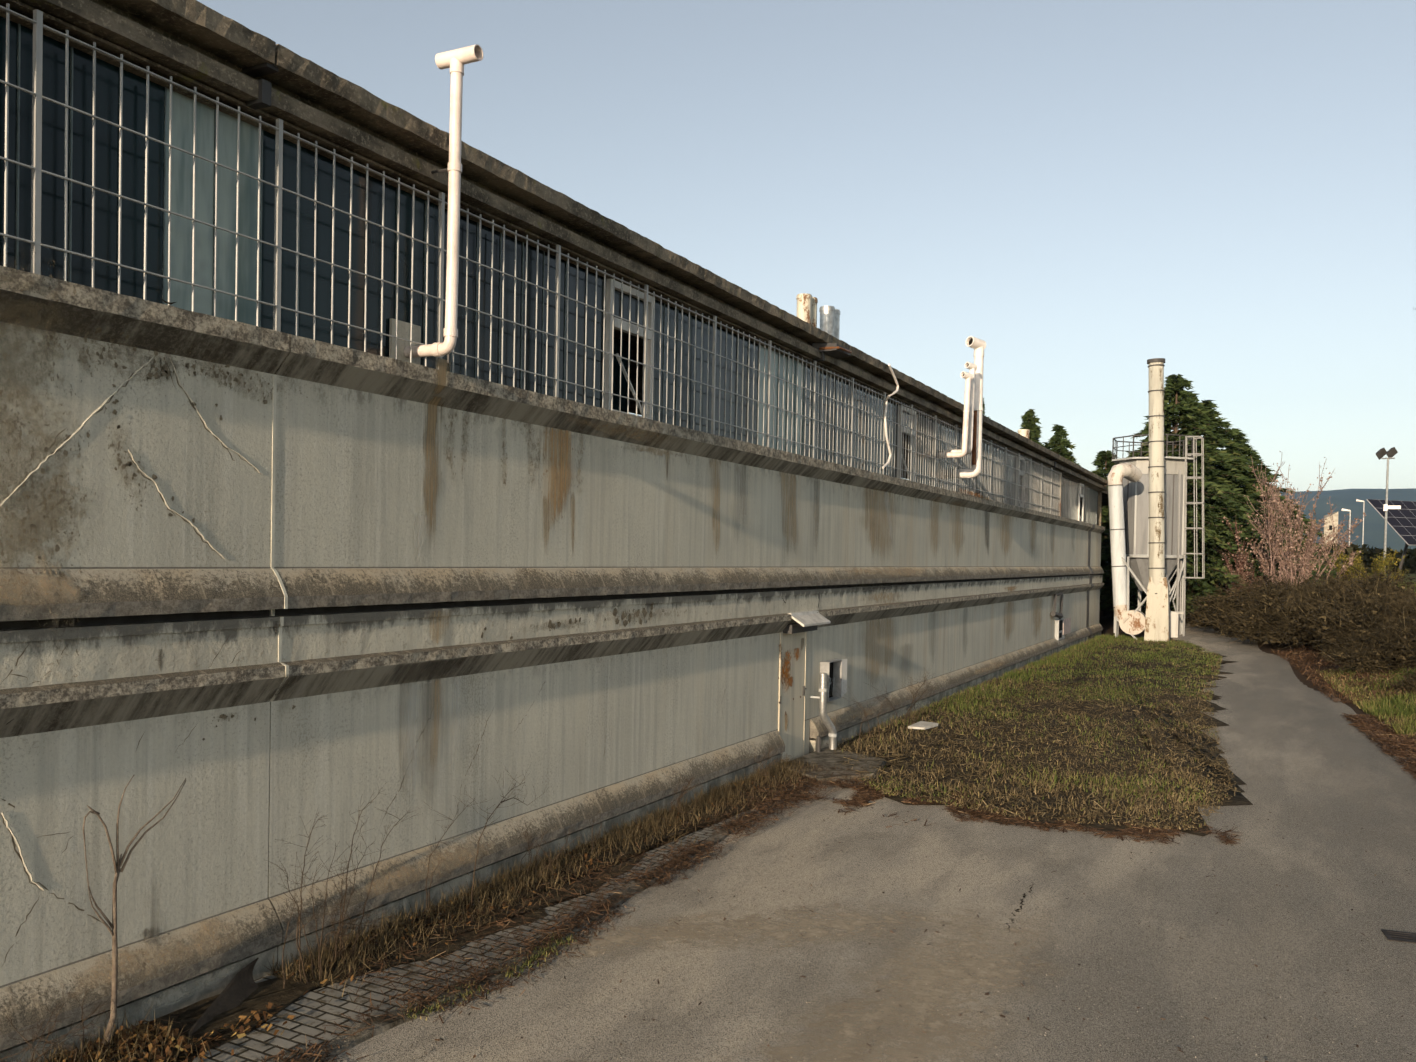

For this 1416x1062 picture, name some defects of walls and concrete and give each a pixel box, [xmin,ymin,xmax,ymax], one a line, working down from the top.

crack [0,357,262,507]
crack [128,449,225,559]
corrosion [540,428,577,544]
corrosion [778,639,804,728]